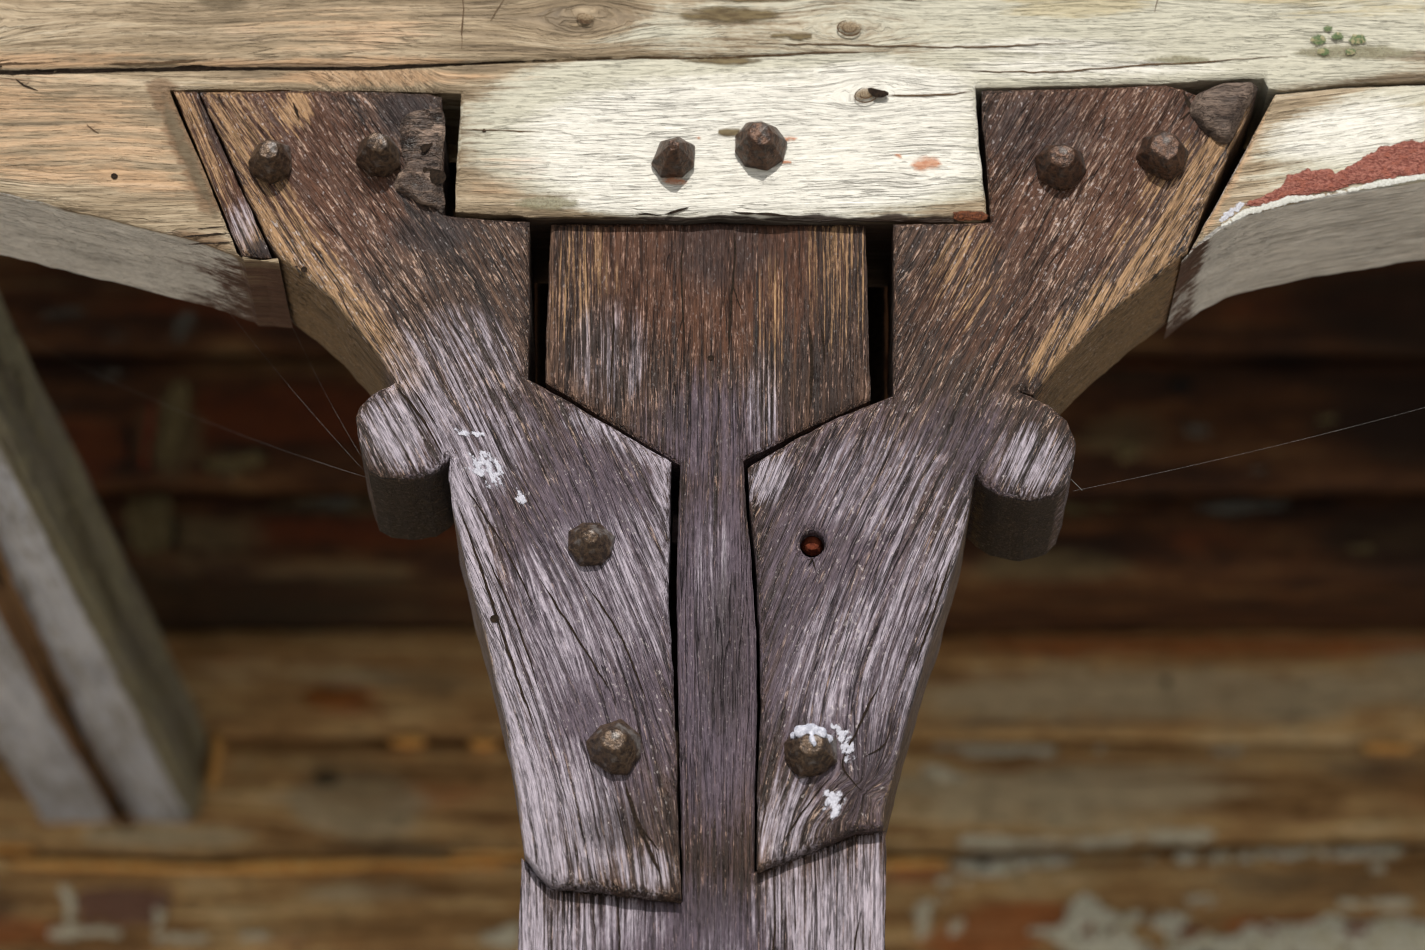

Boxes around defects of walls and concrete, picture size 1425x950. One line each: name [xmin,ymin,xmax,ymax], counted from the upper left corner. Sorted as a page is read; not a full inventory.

peeling [1245,139,1425,206]
peeling [912,829,1405,940]
peeling [1028,893,1425,950]